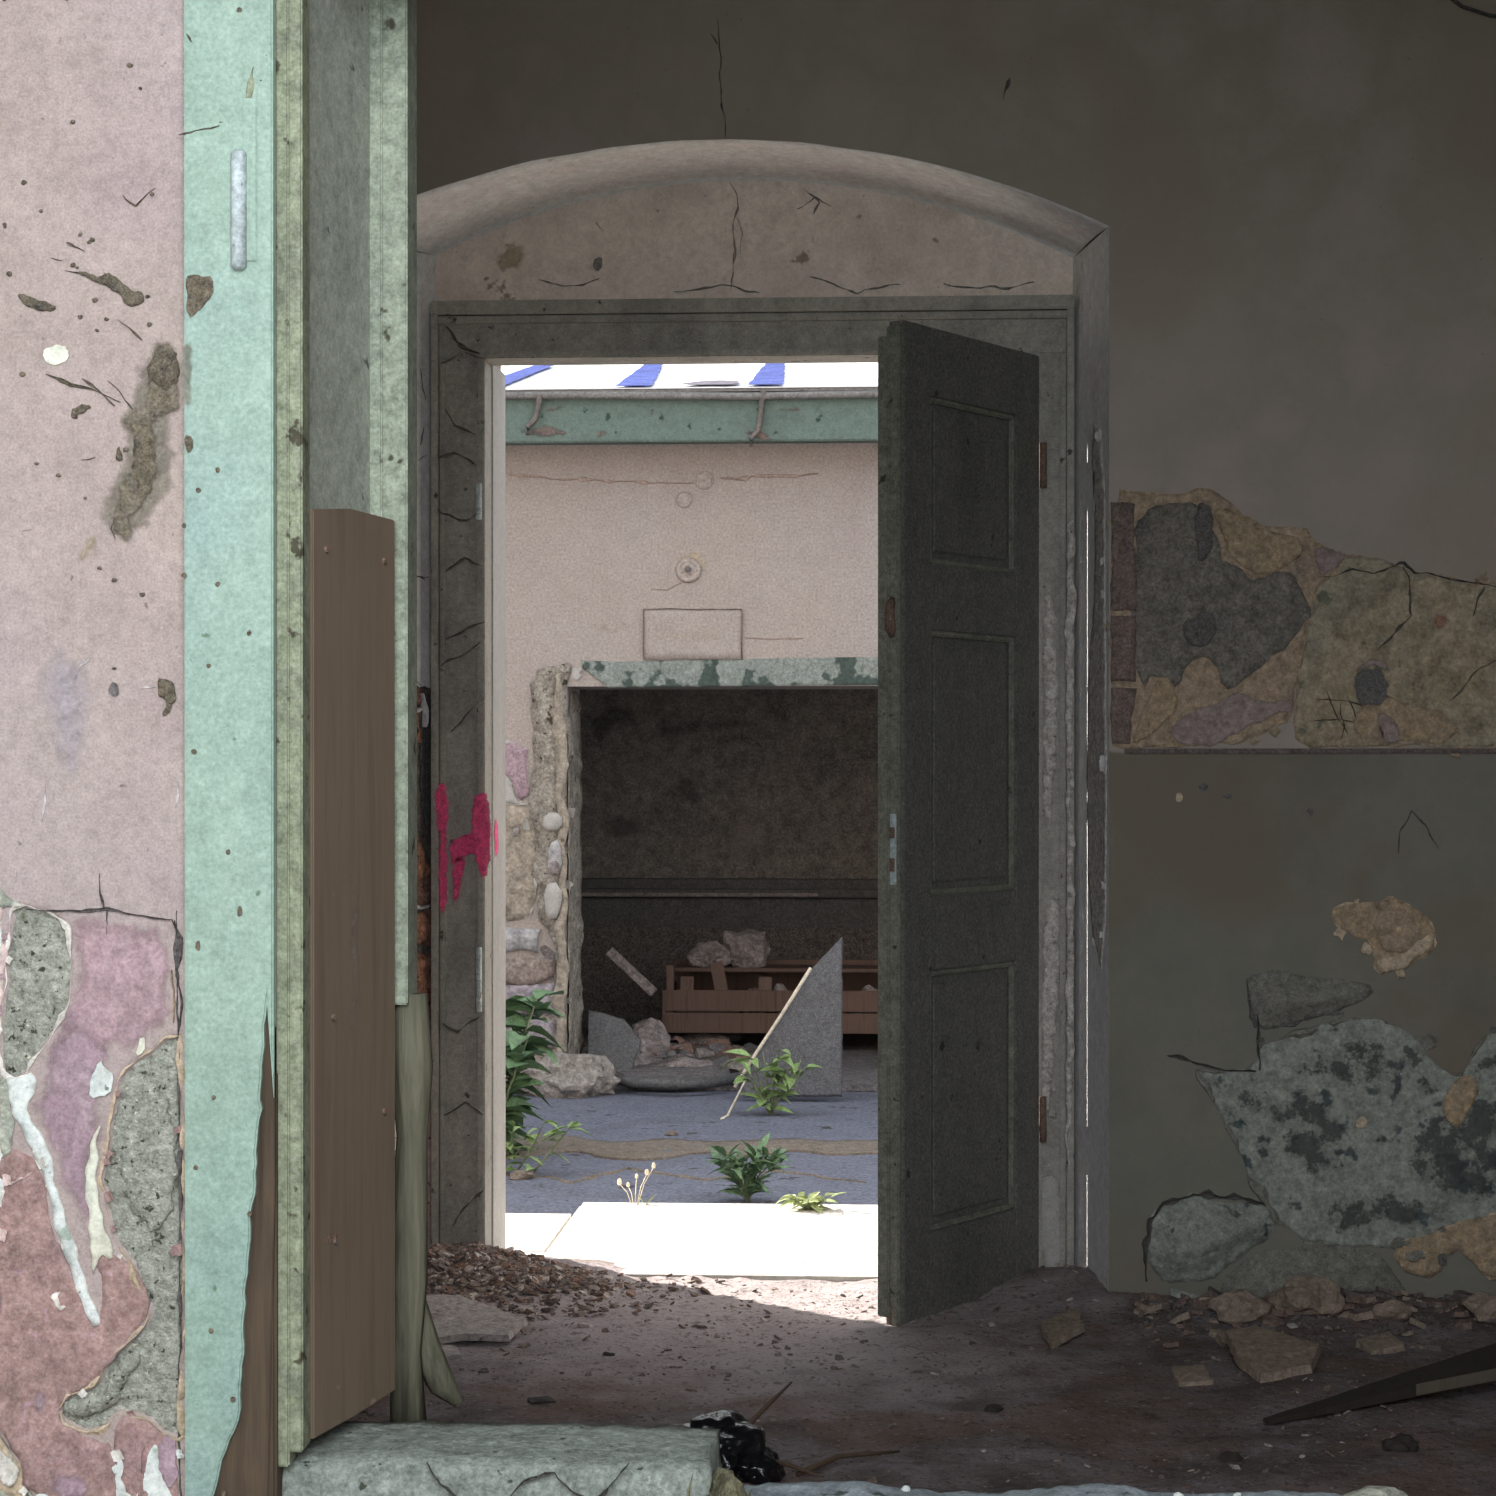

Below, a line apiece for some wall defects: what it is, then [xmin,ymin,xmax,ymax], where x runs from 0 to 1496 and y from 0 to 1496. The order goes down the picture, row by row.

crack [729,182,743,287]
flaking render [417,686,431,1032]
spalling [505,663,584,1054]
spalling [1042,423,1496,1280]
peeling [0,889,185,1496]
crack [25,873,183,1496]
crack [426,1462,456,1496]
crack [510,1463,629,1496]